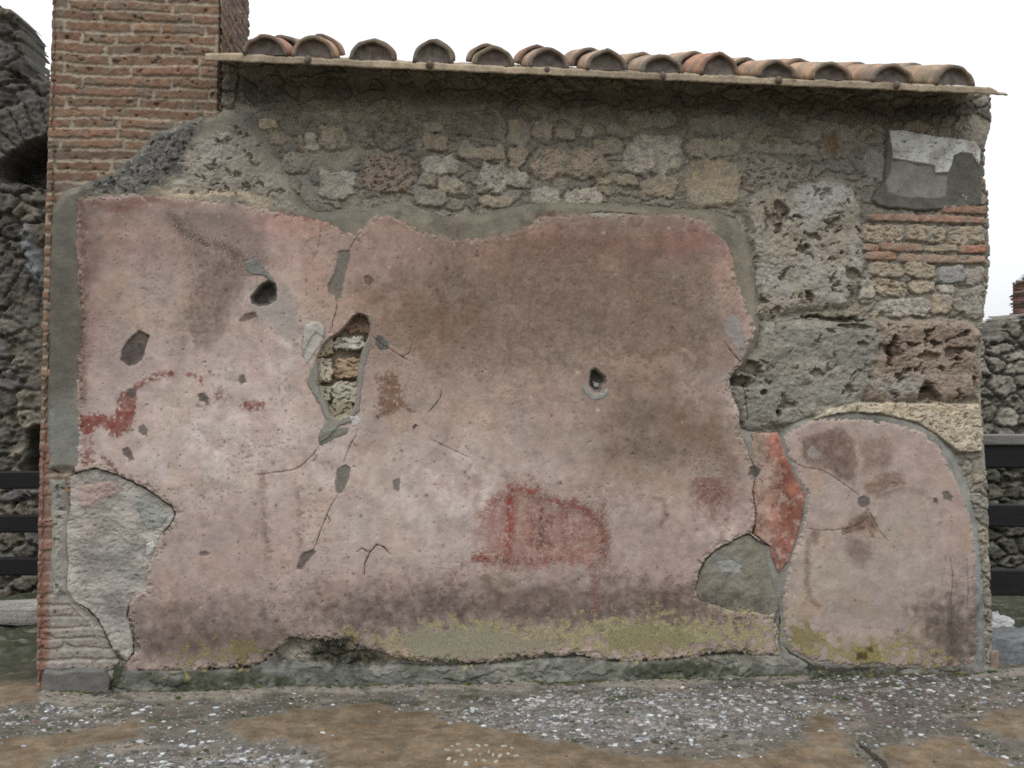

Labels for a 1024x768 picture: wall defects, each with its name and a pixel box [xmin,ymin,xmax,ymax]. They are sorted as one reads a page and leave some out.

peeling [889,130,981,173]
spalling [122,332,150,365]
spalling [66,469,176,662]
crack [360,544,389,573]
spalling [695,534,778,615]